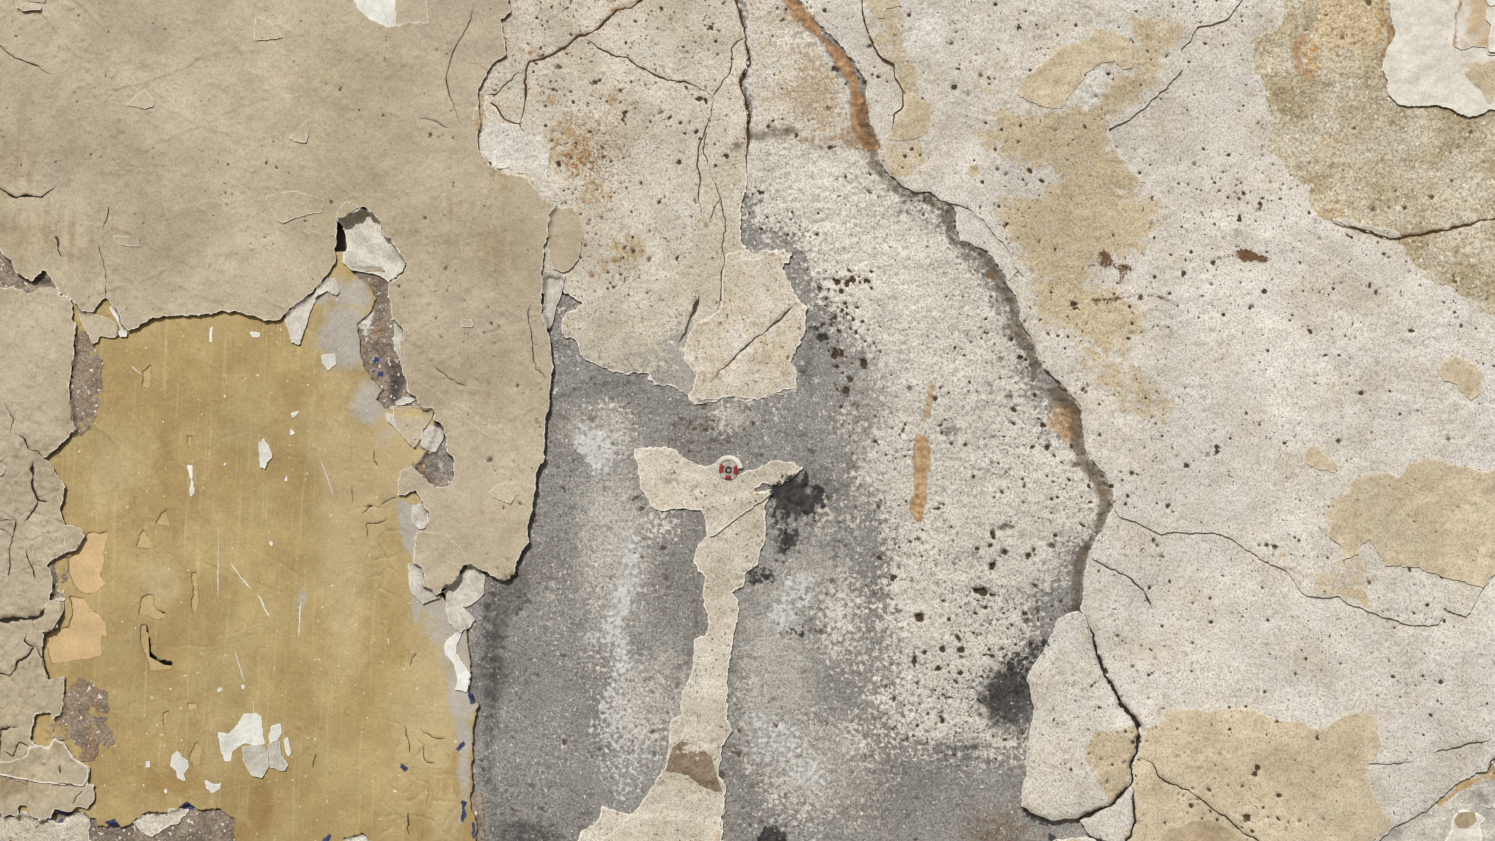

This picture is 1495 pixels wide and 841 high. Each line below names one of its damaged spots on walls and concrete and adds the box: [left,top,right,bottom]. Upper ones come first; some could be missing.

rust [772,0,881,154]
crack [419,0,751,342]
spalling [1251,0,1495,316]
crack [1332,218,1495,240]
crack [527,305,546,378]
spalling [0,0,1113,841]
rust [910,383,935,522]
crack [0,405,83,805]
crack [1091,557,1152,607]
crack [1078,618,1259,841]
crack [1367,740,1495,774]
spalling [1379,761,1495,841]